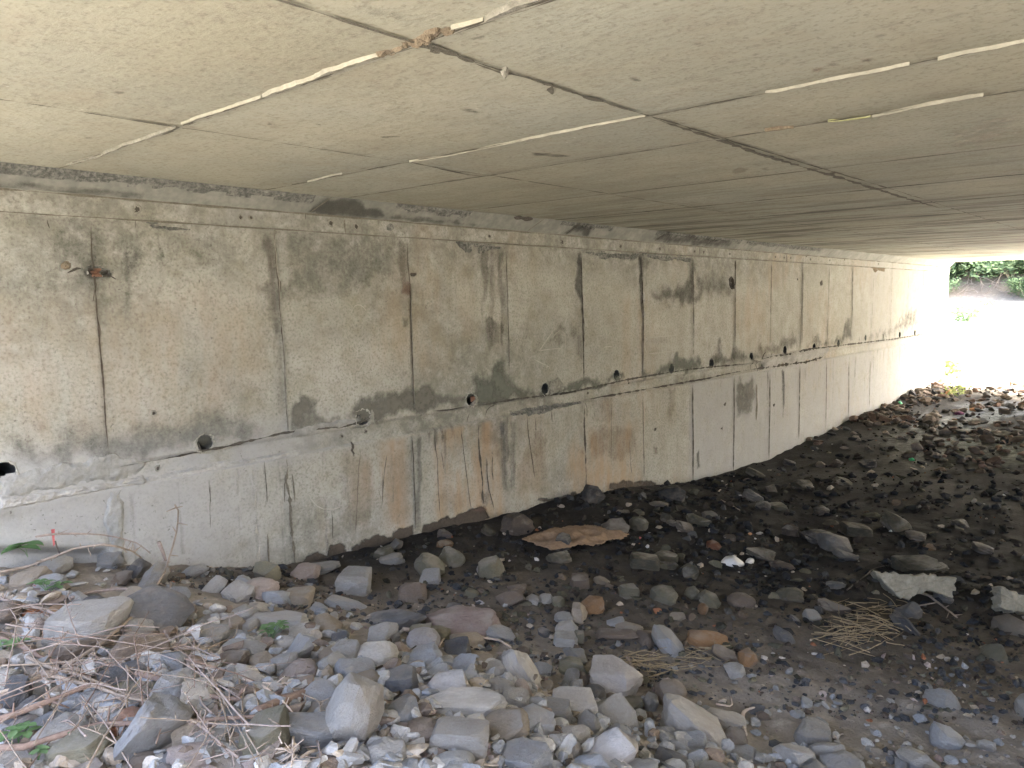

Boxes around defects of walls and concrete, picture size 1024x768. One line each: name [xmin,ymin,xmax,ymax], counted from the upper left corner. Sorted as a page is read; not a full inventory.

water stain [311,199,424,222]
water stain [663,264,693,303]
water stain [353,362,623,422]
water stain [292,396,323,428]